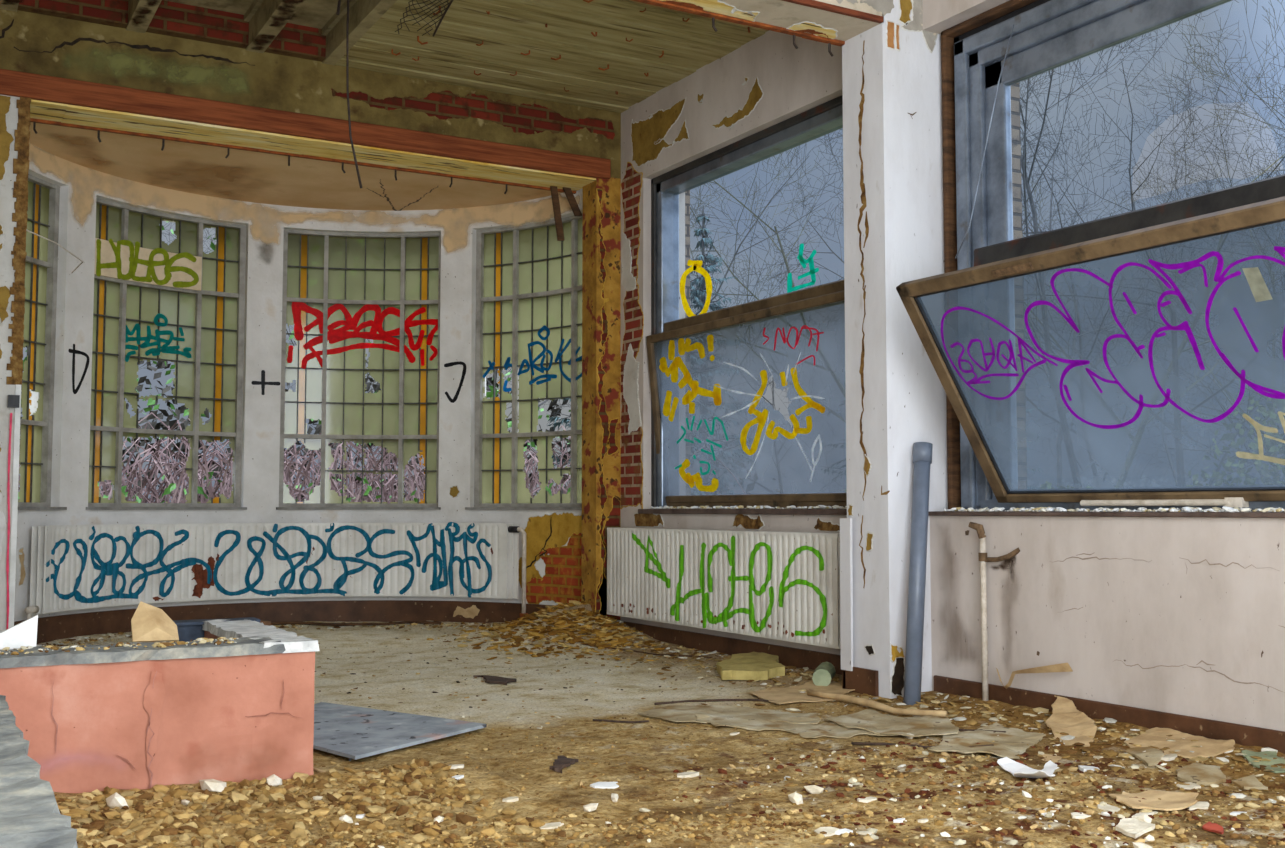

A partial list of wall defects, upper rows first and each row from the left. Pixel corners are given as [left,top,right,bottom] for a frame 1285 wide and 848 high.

crack [0,19,255,66]
peeling [659,0,760,22]
peeling [786,21,838,39]
peeling [837,0,938,53]
peeling [712,77,764,130]
peeling [0,95,15,181]
peeling [0,285,12,324]
spalling [330,87,705,620]
peeling [732,514,765,531]
peeling [814,504,854,533]
crack [1055,552,1279,574]
crack [1114,660,1285,693]